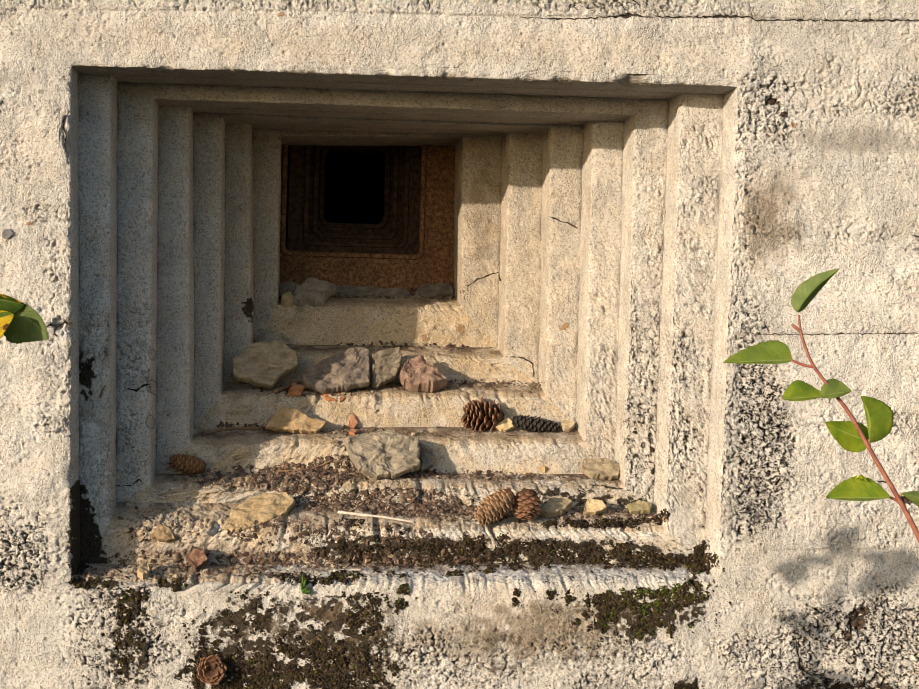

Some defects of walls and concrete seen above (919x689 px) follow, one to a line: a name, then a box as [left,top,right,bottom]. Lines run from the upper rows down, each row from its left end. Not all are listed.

crack [523,0,919,22]
damp [189,386,716,689]